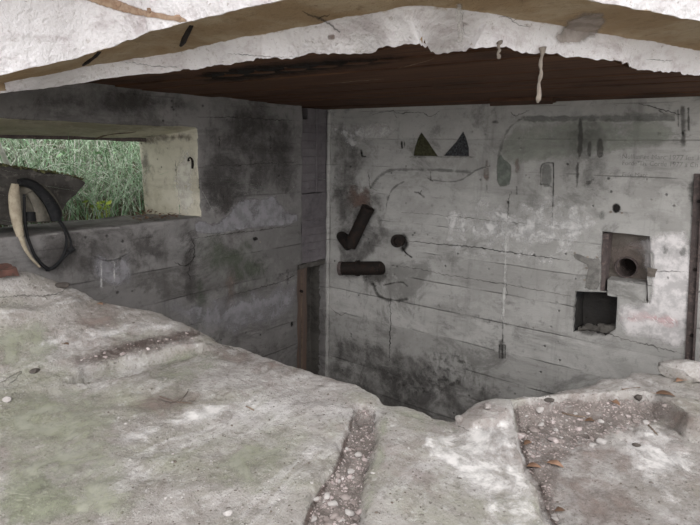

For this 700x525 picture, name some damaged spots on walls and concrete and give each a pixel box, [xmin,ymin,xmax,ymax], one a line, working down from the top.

spalling [556,14,604,43]
water stain [180,250,291,331]
water stain [363,354,466,415]